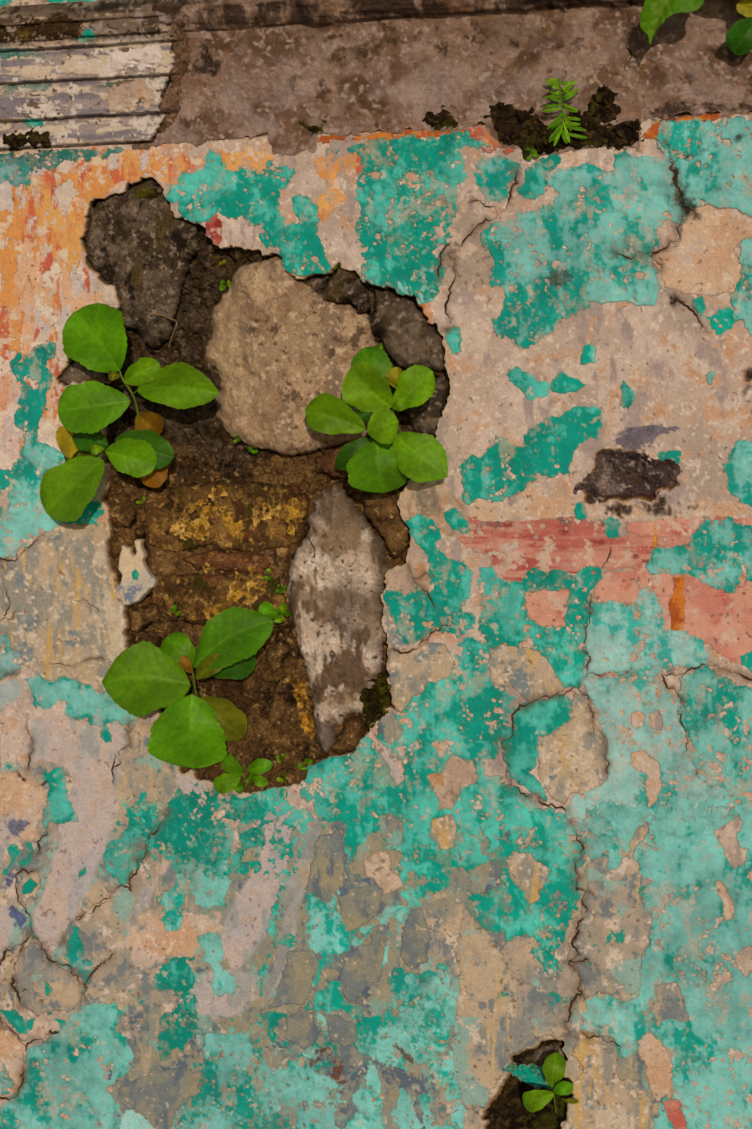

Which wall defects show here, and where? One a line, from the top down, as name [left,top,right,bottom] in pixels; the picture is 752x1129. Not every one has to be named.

peeling [0,46,45,60]
peeling [74,28,164,115]
crack [437,172,518,327]
crack [617,143,688,268]
crack [674,295,705,329]
peeling [0,111,752,743]
crack [111,718,141,782]
peeling [0,450,752,1129]
crack [501,536,629,1053]
crack [0,821,162,1101]